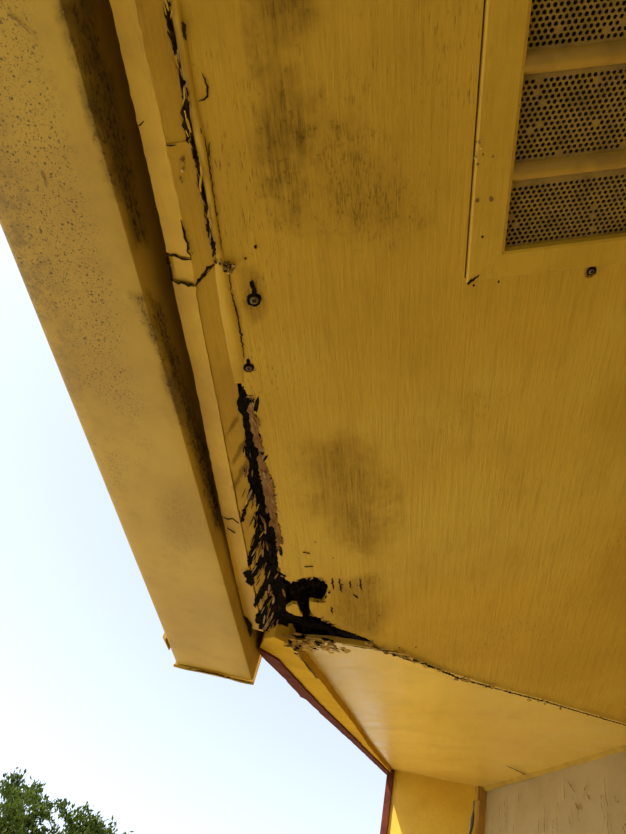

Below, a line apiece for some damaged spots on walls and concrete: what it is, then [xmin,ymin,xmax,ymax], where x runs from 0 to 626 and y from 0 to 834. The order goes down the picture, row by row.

crack [163,0,245,357]
peeling [247,400,284,546]